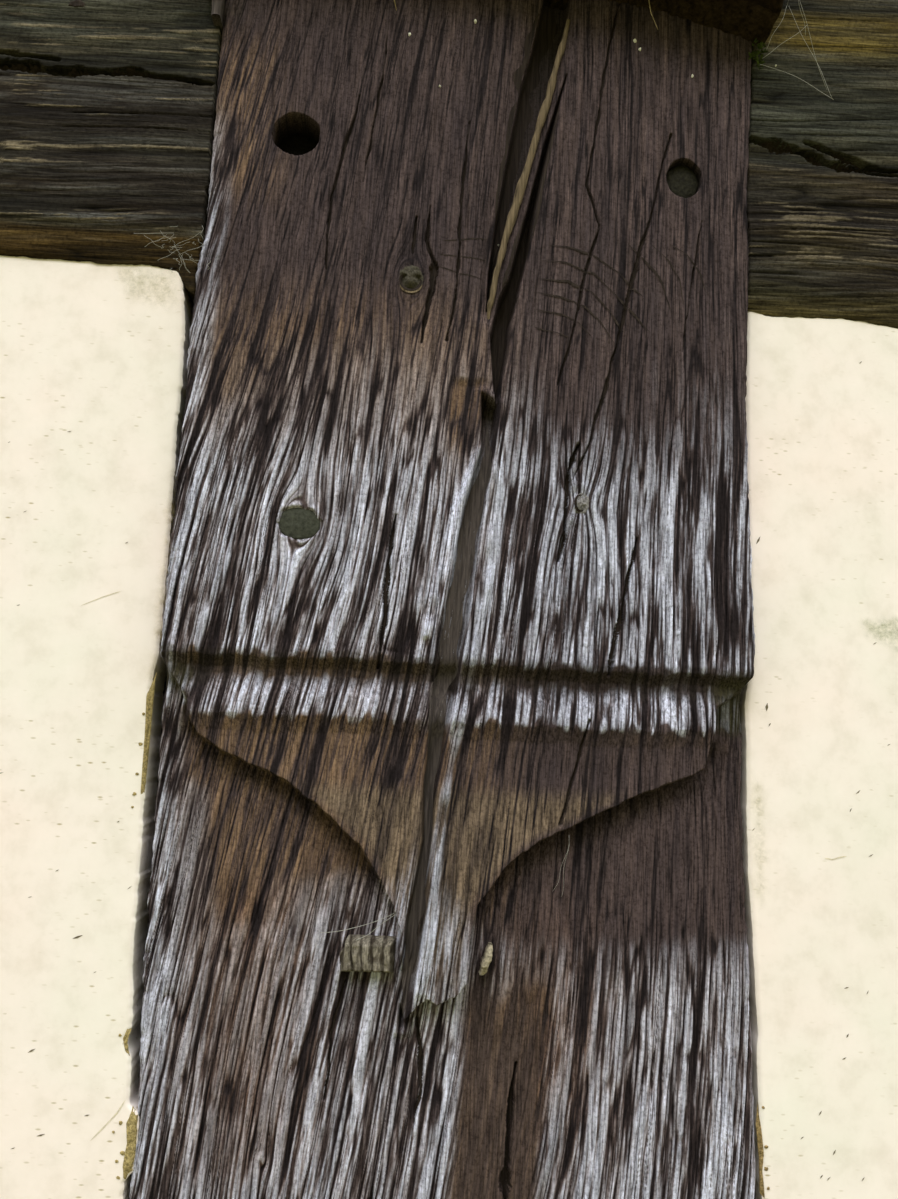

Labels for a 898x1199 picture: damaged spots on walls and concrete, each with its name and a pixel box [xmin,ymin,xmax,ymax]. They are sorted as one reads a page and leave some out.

crack [399,2,706,1119]